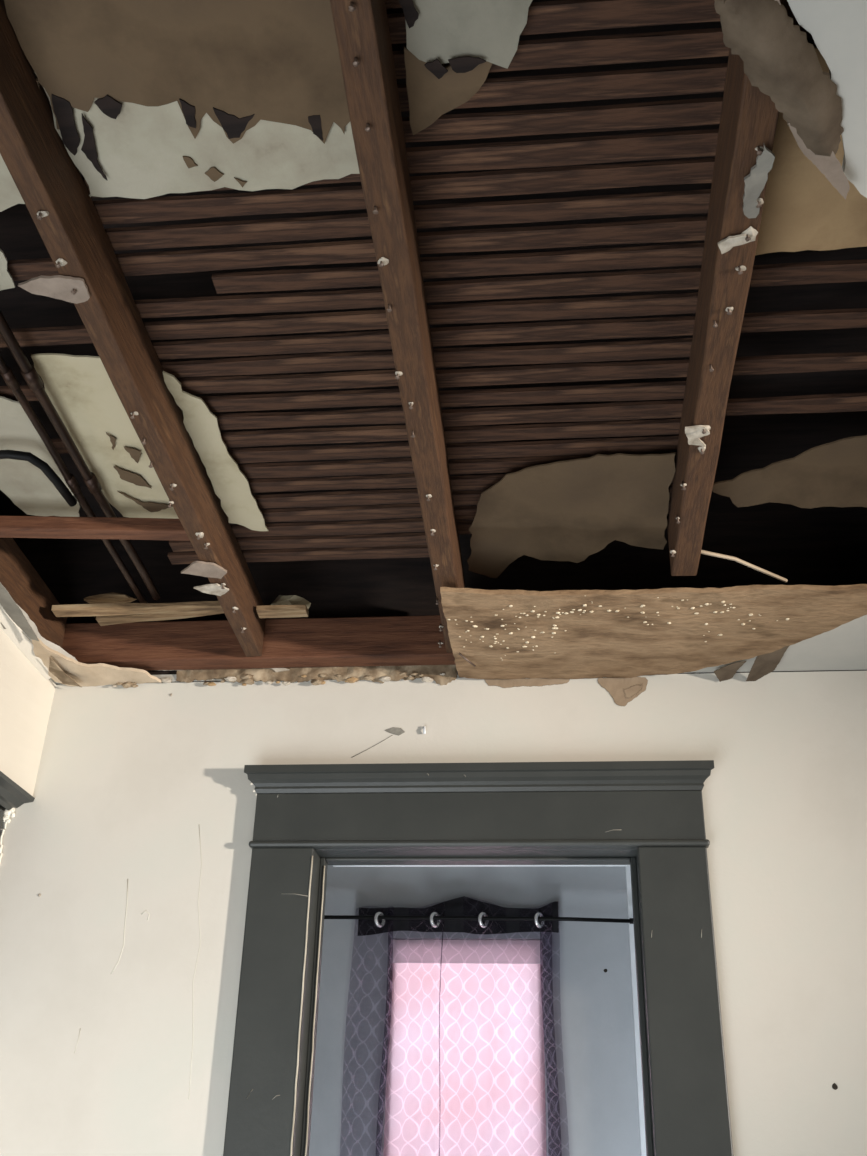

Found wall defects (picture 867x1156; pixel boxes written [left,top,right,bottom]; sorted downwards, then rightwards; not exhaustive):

spalling [0,582,457,688]
peeling [484,678,570,688]
peeling [598,677,648,706]